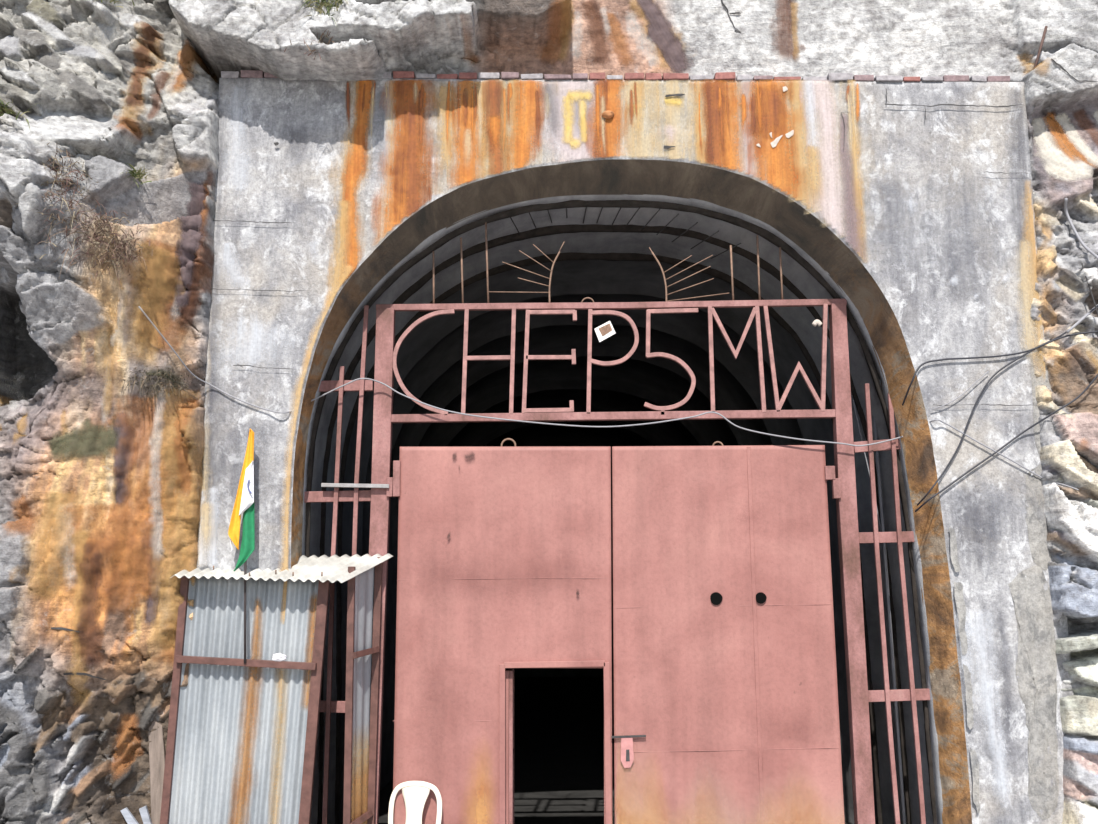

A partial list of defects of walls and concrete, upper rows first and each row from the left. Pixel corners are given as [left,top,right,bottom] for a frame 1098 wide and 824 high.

corrosion [564,80,642,157]
corrosion [695,80,811,208]
peeling [757,130,794,147]
corrosion [841,81,863,257]
corrosion [1021,187,1045,371]
corrosion [282,80,549,621]
corrosion [231,601,260,824]
corrosion [306,597,317,706]
corrosion [351,746,369,824]